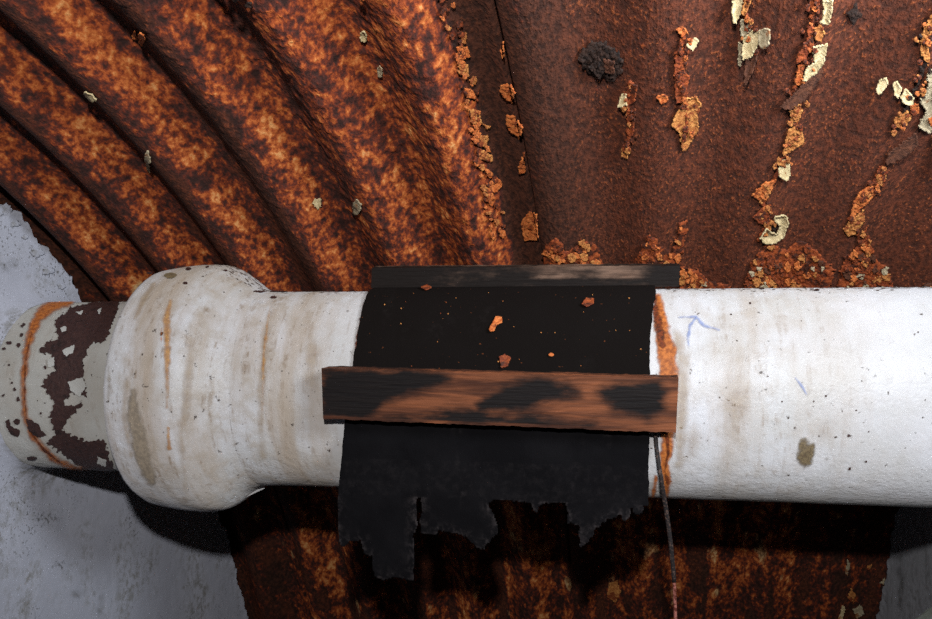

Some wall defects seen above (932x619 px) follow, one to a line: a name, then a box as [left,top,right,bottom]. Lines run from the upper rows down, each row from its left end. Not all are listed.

peeling [731,0,771,86]
rust [439,0,506,241]
peeling [751,0,834,244]
peeling [843,14,932,258]
rust [521,211,603,265]
rust [634,220,731,289]
rust [744,235,893,288]
rust [653,294,678,375]
rust [21,301,89,471]
peeling [5,301,120,472]
peeling [128,390,155,485]
rust [652,432,674,497]